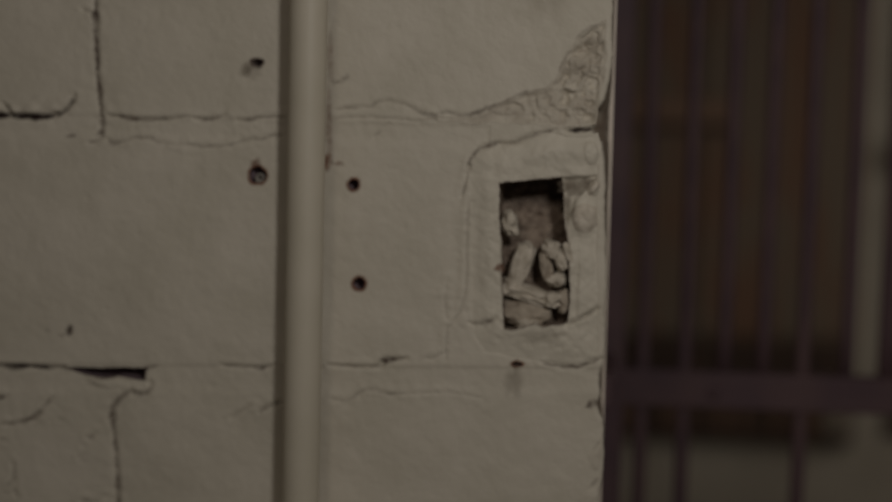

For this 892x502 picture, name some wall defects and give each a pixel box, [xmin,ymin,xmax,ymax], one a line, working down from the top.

crack [0,110,66,120]
crack [94,4,102,95]
spalling [419,20,608,128]
crack [571,126,591,134]
spalling [496,177,591,330]
crack [7,362,49,370]